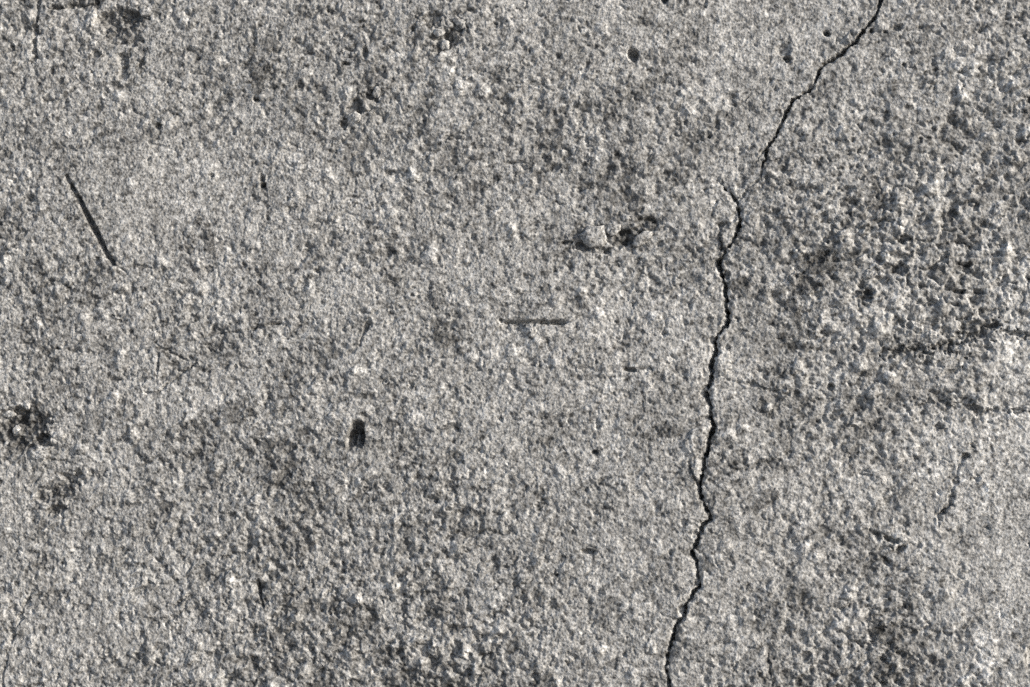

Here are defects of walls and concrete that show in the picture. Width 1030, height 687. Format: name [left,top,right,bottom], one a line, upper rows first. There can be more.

crack [664,0,884,687]